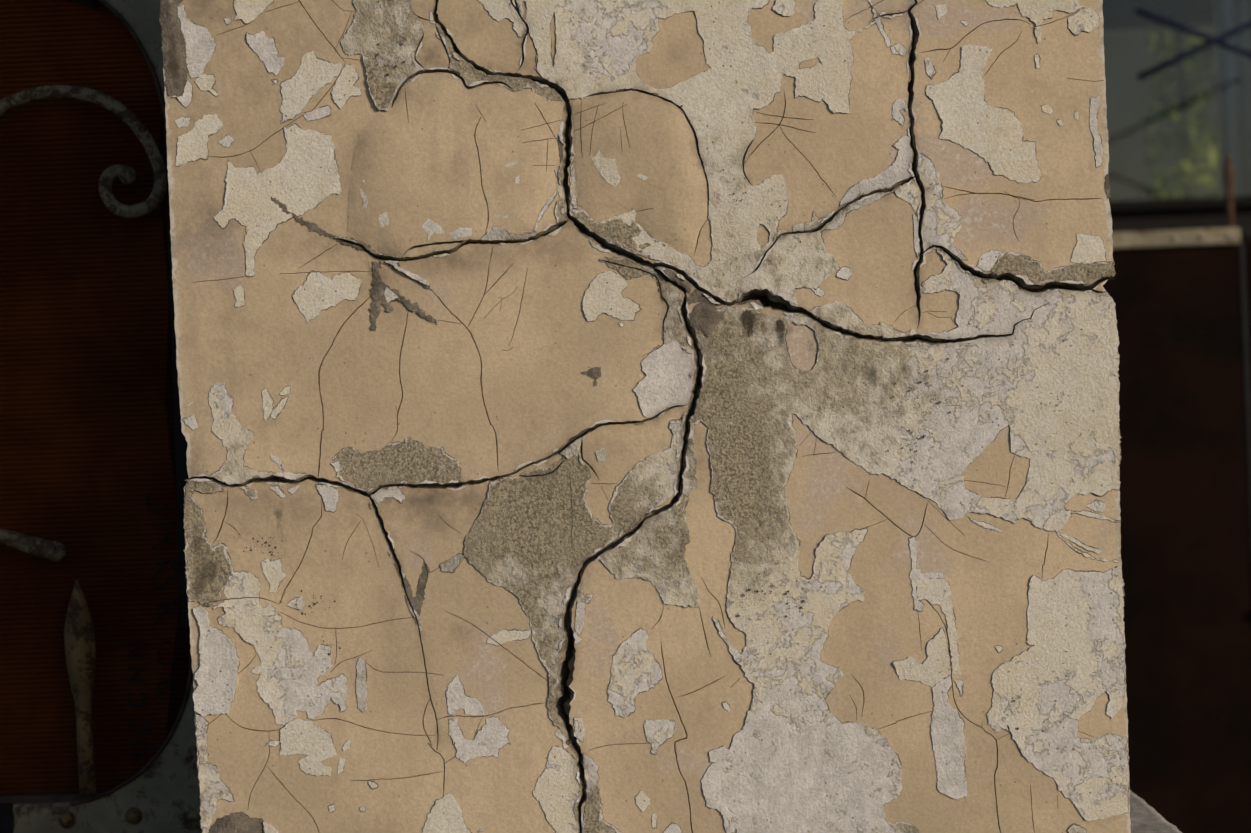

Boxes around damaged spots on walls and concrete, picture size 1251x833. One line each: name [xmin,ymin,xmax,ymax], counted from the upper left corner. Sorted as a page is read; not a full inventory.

peeling [159,0,1130,833]
crack [185,0,1116,833]